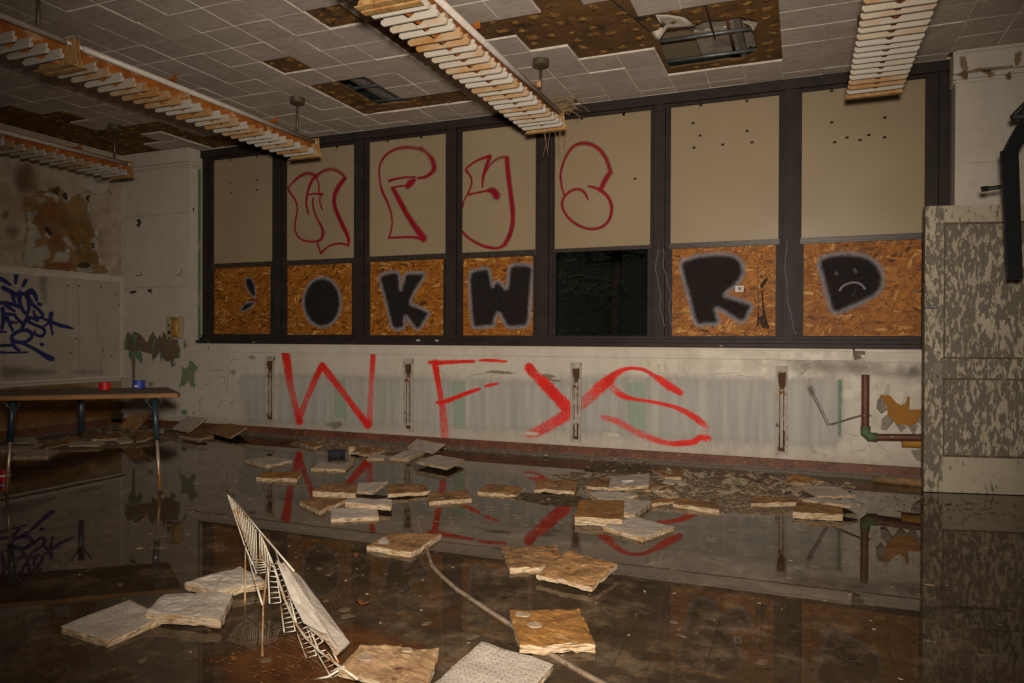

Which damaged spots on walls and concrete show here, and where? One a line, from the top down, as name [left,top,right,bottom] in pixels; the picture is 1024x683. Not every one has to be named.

flaking render [21,186,108,274]
peeling [124,331,198,389]
peeling [876,384,922,434]